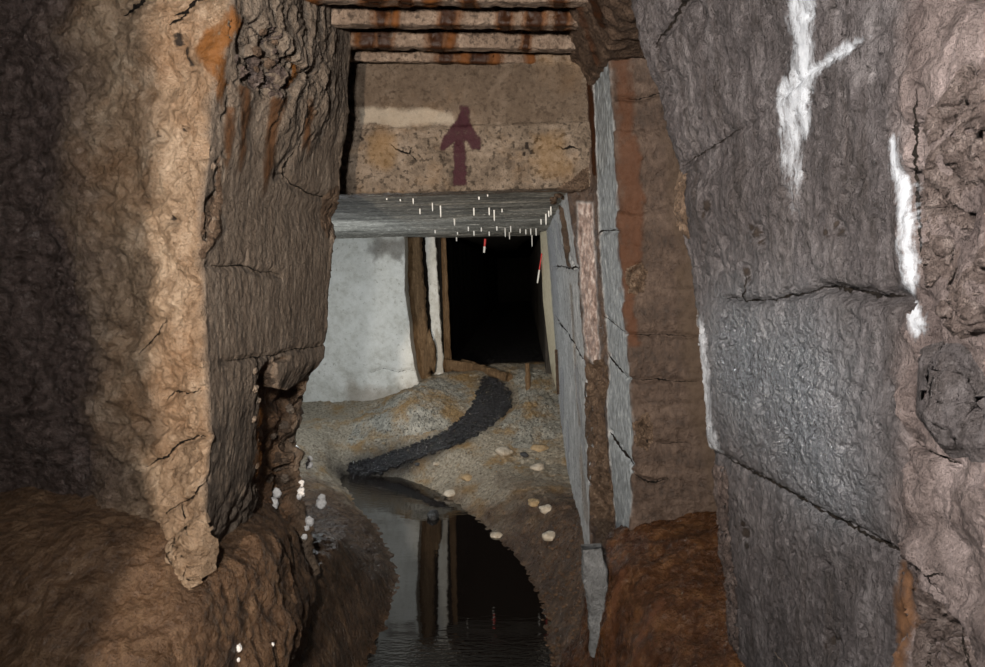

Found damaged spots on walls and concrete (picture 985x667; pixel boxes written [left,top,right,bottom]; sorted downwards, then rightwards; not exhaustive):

crack [124,0,146,16]
crack [169,0,203,25]
rust [197,8,240,99]
rust [355,0,503,66]
rust [497,7,512,31]
rust [522,0,605,64]
crack [727,276,906,302]
crack [147,435,206,467]
crack [166,479,208,529]
crack [717,452,900,551]